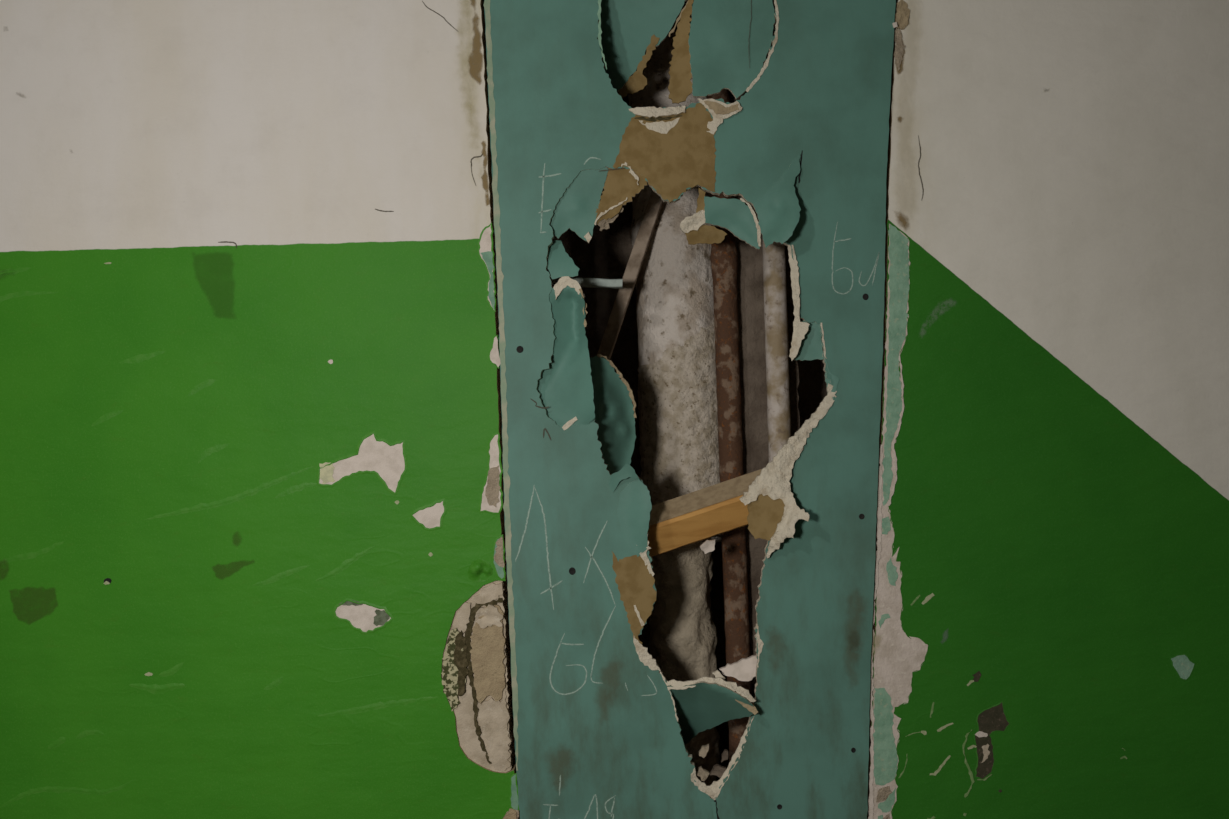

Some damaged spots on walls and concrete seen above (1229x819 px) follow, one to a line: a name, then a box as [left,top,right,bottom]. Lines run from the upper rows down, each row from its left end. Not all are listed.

peeling [317,431,408,504]
peeling [332,598,394,635]
peeling [410,498,447,531]
spalling [441,534,520,819]
spalling [537,162,764,800]
spalling [680,154,840,558]
peeling [868,224,929,819]
peeling [962,701,1010,798]